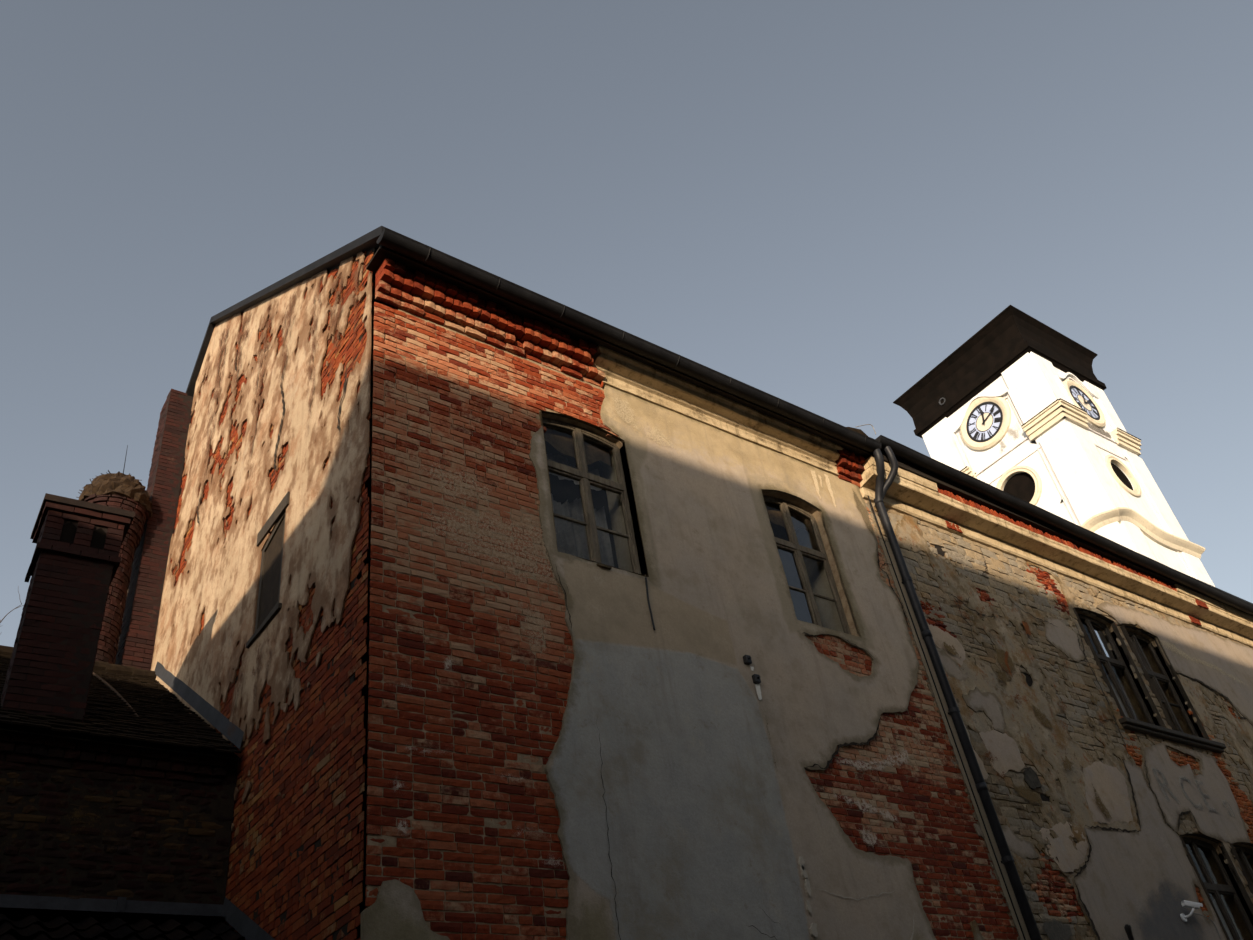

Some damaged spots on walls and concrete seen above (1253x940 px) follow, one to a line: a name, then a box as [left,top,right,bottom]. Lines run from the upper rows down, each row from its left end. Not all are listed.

flaking render [151,250,618,940]
flaking render [1026,564,1086,663]
crack [596,721,621,940]
flaking render [805,500,1019,940]
flaking render [974,730,1050,802]
spalling [1001,821,1088,923]
flaking render [1083,761,1133,824]
spalling [1167,710,1253,844]